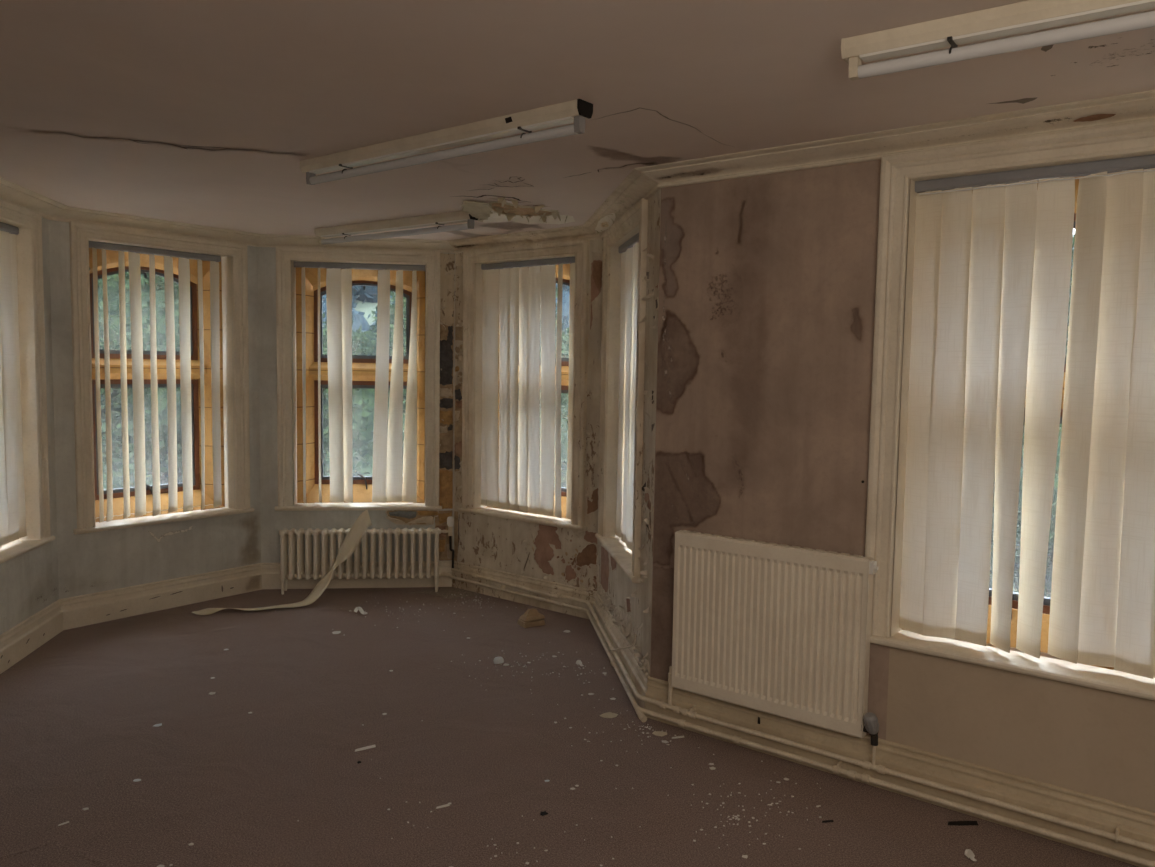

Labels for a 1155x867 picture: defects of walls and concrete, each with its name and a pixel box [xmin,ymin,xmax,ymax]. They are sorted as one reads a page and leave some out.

peeling [450,195,575,224]
peeling [522,470,653,677]